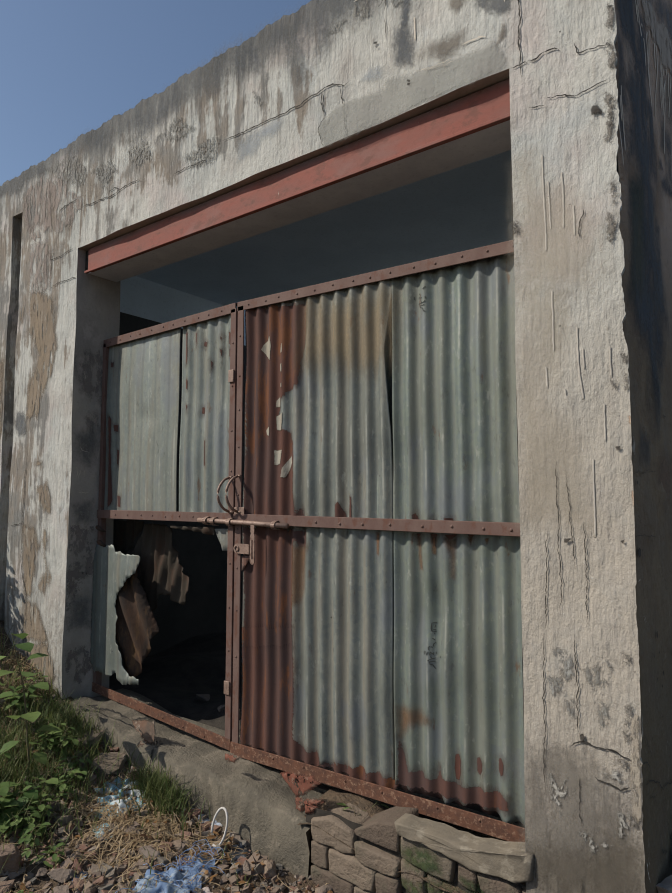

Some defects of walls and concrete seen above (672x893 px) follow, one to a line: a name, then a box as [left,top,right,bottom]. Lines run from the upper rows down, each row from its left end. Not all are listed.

crack [220,83,347,145]
leakage [395,0,416,64]
crack [529,80,606,108]
crack [50,180,137,260]
leakage [617,0,672,396]
peeling [20,290,57,420]
corrosion [243,303,381,517]
peeling [36,481,51,514]
peeling [22,525,57,685]
peeling [66,526,93,611]
corrosion [240,526,508,811]
crack [542,463,672,825]